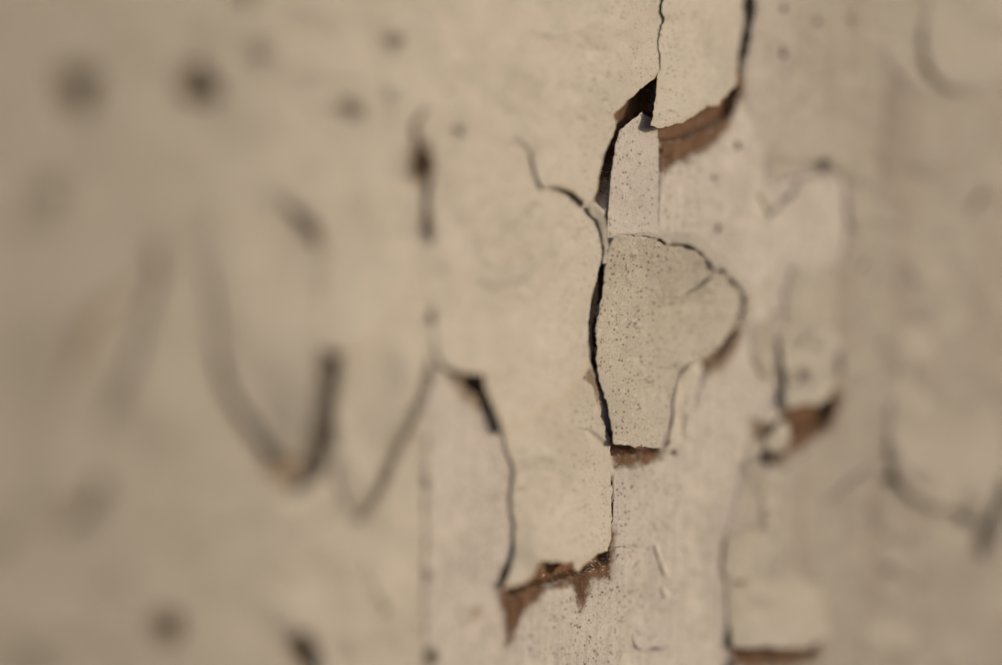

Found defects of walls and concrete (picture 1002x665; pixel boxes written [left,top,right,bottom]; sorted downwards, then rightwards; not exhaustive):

peeling [763,110,854,173]
peeling [185,0,742,589]
peeling [749,321,842,408]
peeling [765,422,790,452]
peeling [723,528,835,649]